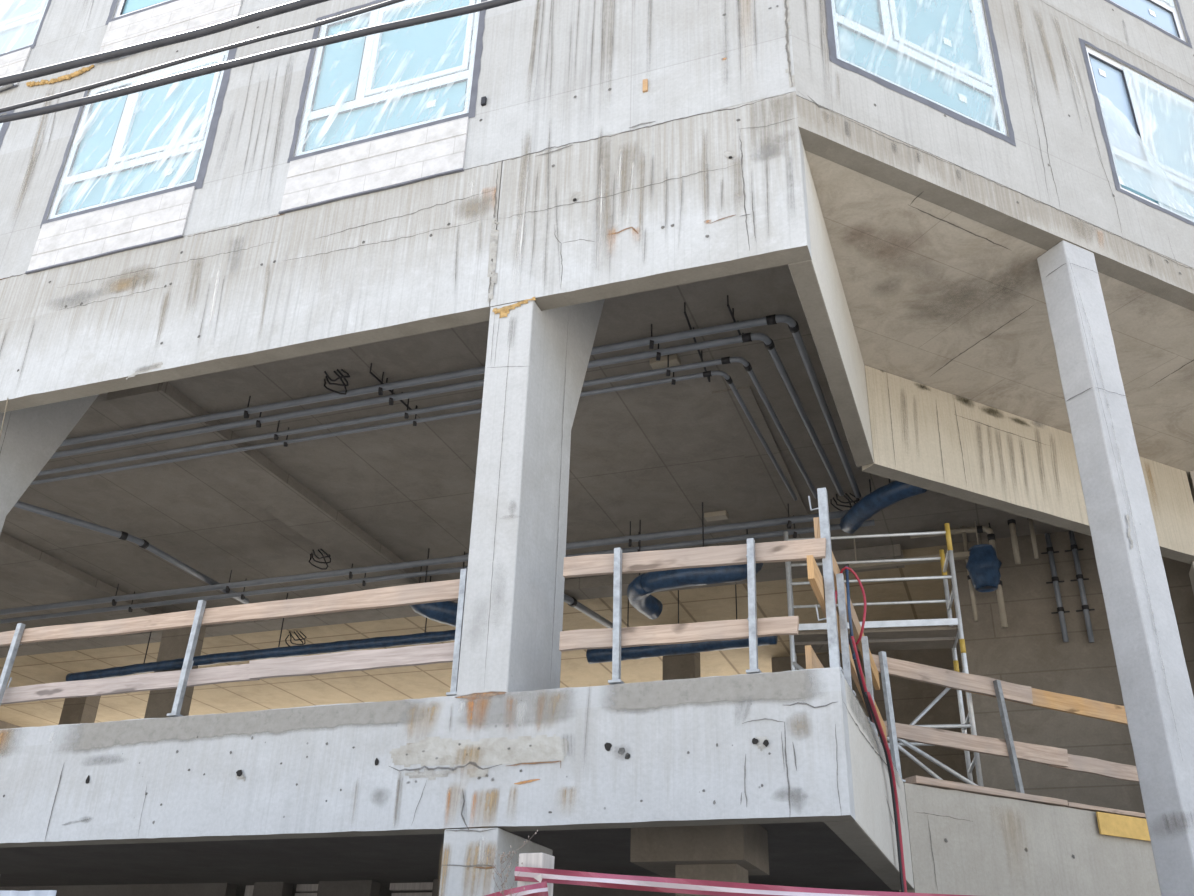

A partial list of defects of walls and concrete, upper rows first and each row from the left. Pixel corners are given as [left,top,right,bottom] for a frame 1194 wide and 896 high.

leakage [597,142,653,235]
crack [57,87,1194,310]
rust [455,692,513,721]
spalling [375,734,569,783]
rust [473,791,497,814]
crack [740,755,748,803]
crack [742,702,887,808]
crack [886,798,973,890]